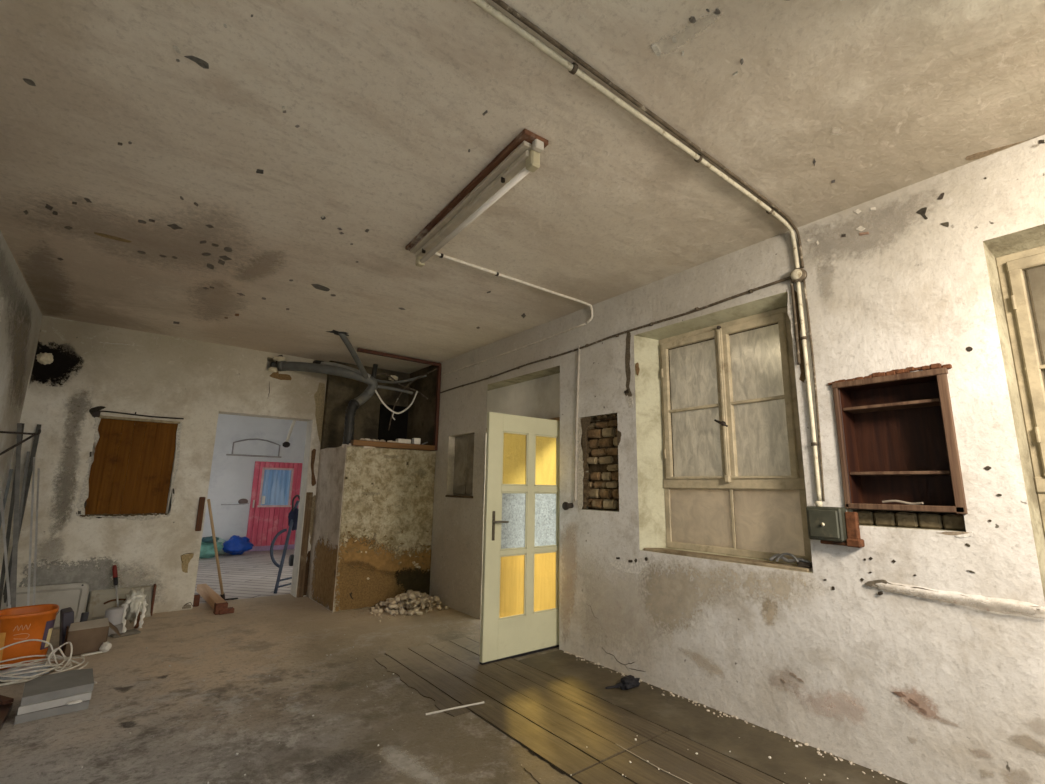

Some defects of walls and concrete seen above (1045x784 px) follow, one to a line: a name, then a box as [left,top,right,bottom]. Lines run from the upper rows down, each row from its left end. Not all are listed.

damp [200,225,232,269]
spalling [624,332,640,408]
damp [58,392,90,522]
spalling [577,413,617,512]
spalling [893,689,937,719]
crack [520,743,572,784]